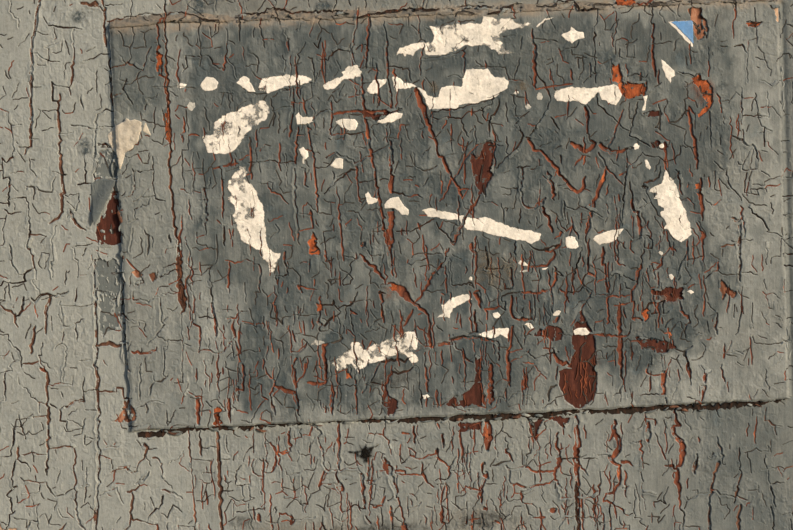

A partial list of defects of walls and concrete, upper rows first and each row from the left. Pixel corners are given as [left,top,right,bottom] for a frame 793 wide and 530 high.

crack [430,0,518,40]
peeling [611,62,647,100]
peeling [688,7,708,40]
peeling [692,73,712,117]
crack [720,0,793,86]
crack [0,0,111,278]
peeling [470,142,495,195]
peeling [91,118,156,335]
peeling [534,310,598,408]
crack [720,279,793,392]
crack [123,471,182,530]
crack [703,448,758,530]